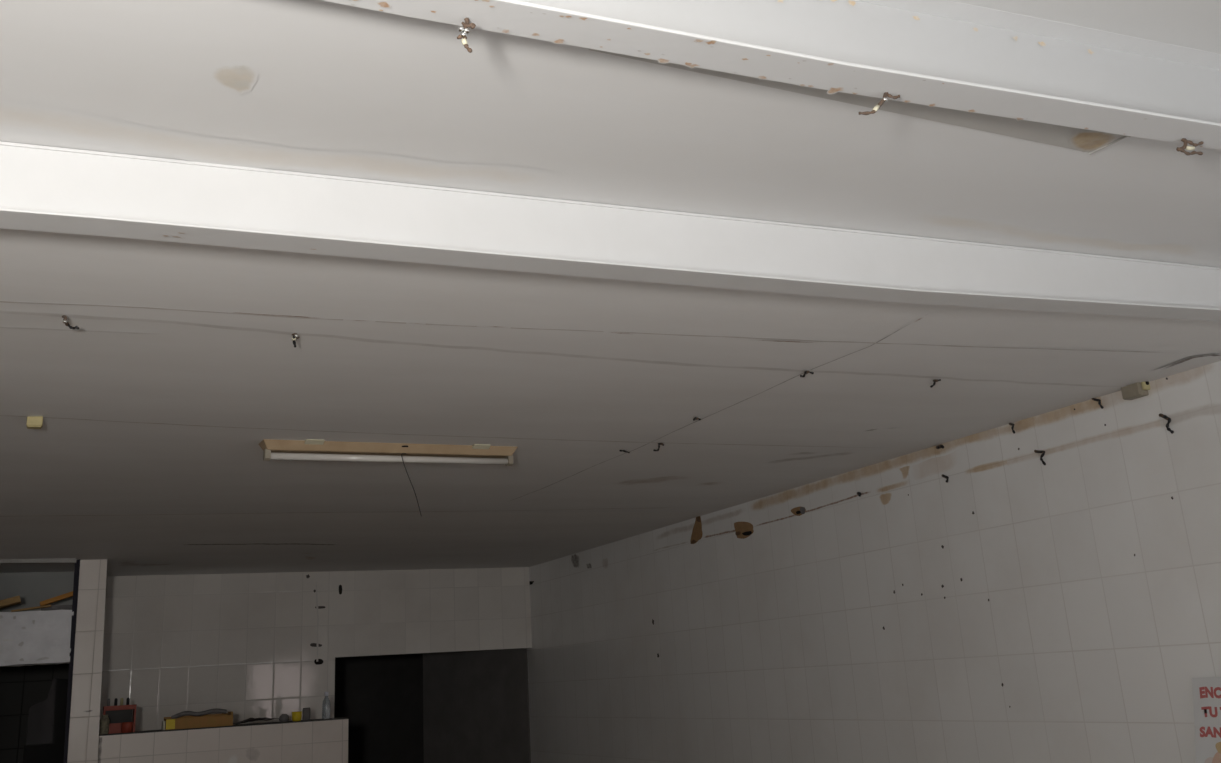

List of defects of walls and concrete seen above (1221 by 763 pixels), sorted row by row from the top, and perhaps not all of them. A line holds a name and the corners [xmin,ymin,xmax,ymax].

leakage [209,64,258,94]
leakage [0,101,560,196]
spalling [791,507,806,516]
spalling [690,516,703,544]
spalling [734,522,754,539]